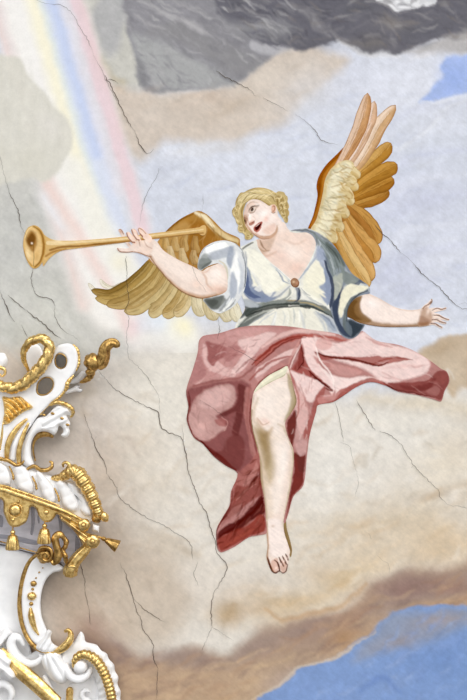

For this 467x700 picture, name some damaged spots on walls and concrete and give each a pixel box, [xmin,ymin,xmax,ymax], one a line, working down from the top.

crack [104,76,151,154]
crack [2,271,68,337]
crack [110,375,228,647]
crack [126,574,160,680]